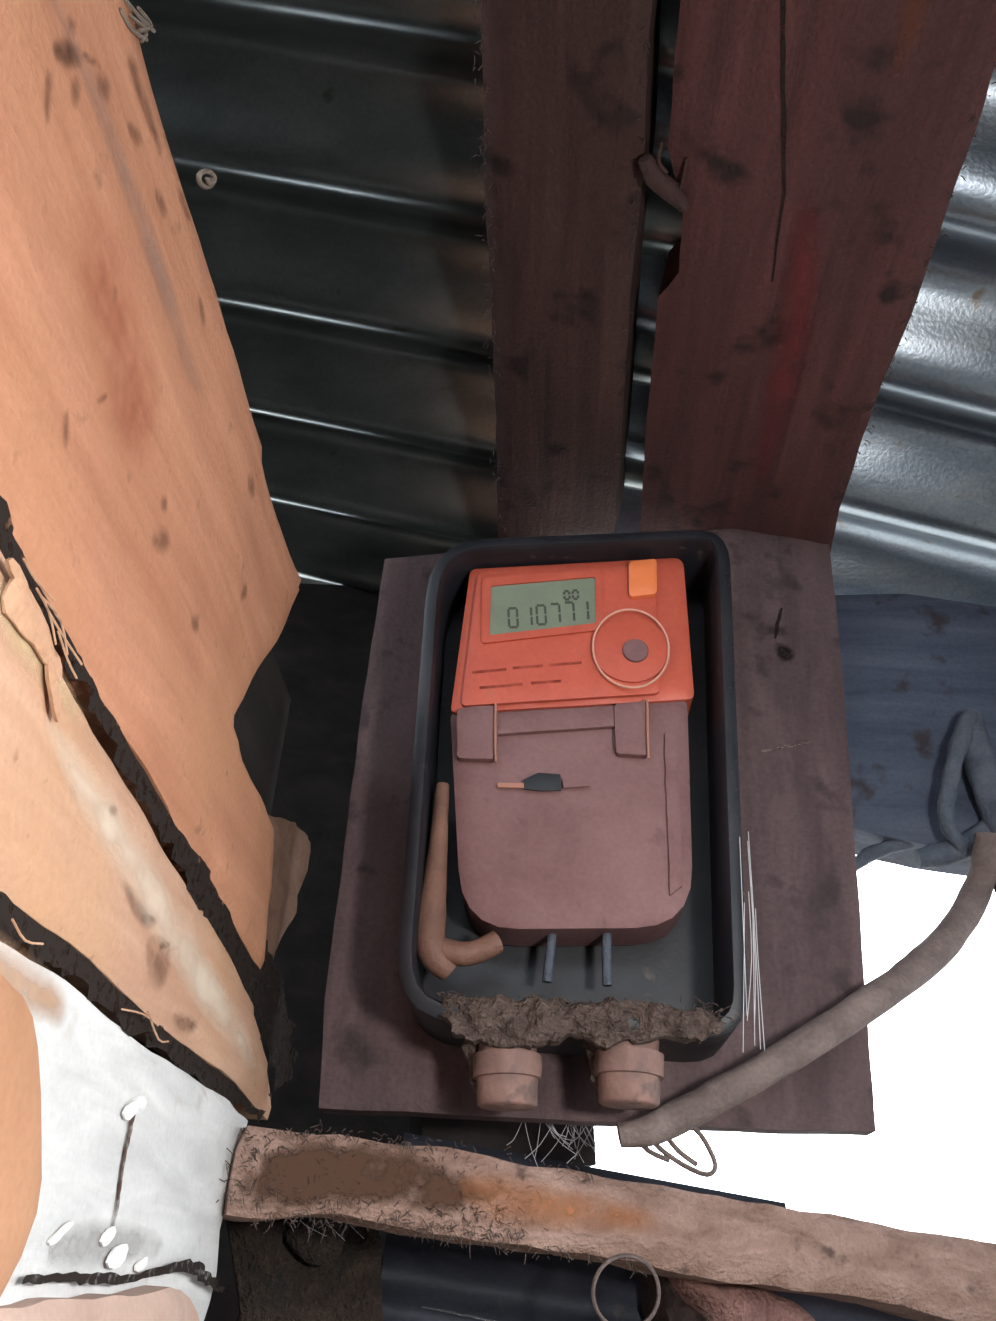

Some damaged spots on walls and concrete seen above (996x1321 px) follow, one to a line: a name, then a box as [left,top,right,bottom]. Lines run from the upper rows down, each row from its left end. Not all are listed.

crack [771,0,787,282]